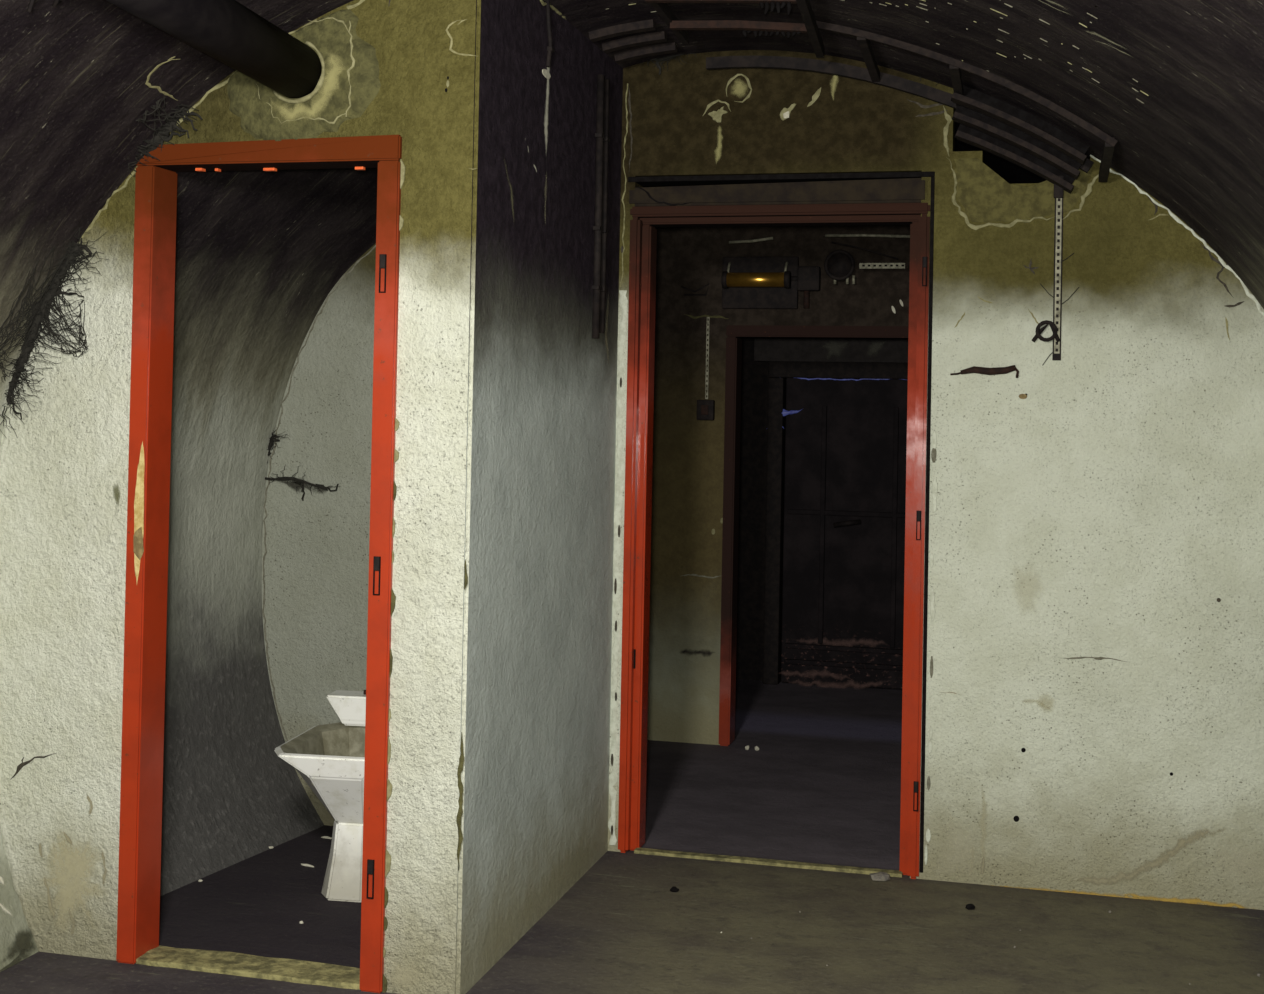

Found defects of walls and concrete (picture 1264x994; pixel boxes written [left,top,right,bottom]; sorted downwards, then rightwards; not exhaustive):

damp [542,67,551,147]
peeling [703,74,752,160]
peeling [780,88,821,120]
peeling [133,441,145,582]
crack [11,753,55,779]